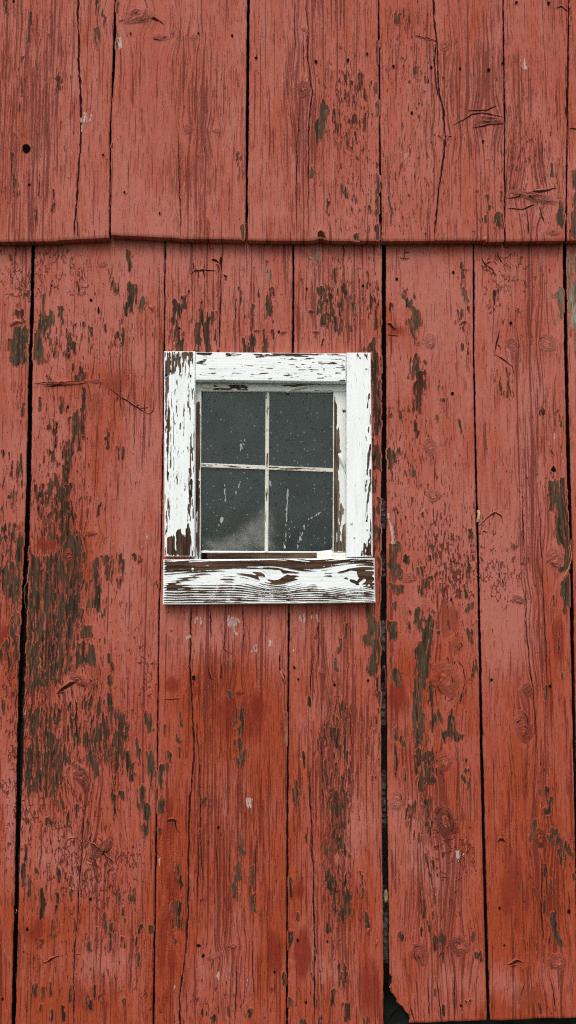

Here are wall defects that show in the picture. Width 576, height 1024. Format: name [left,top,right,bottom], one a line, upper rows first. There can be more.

crack [74,0,84,237]
crack [415,0,503,235]
peeling [0,248,184,840]
peeling [152,247,479,965]
peeling [544,471,571,615]